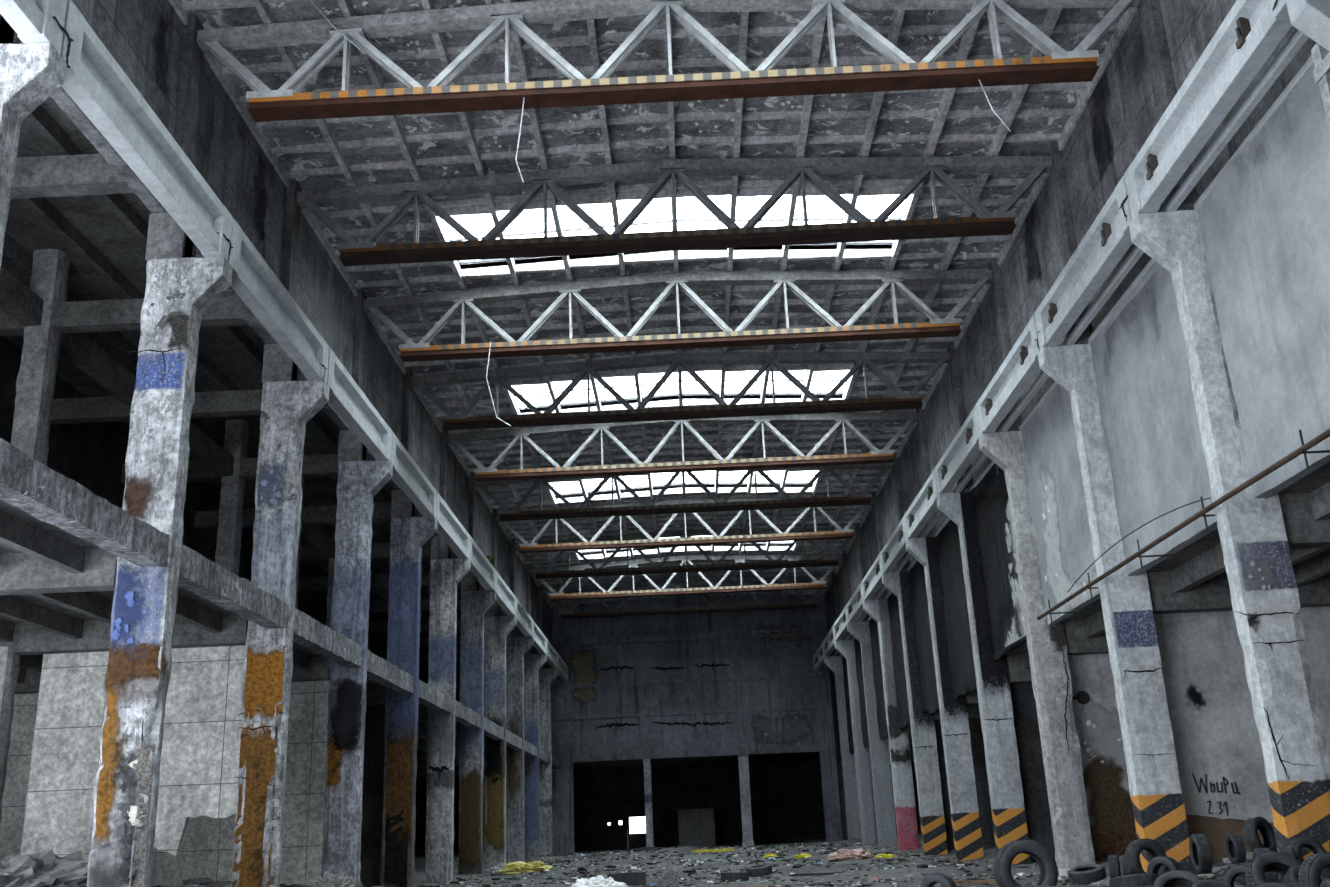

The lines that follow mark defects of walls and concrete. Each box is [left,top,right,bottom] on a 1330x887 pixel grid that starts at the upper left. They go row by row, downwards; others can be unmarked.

peeling [111,565,144,659]
spalling [112,735,156,887]
spalling [268,780,281,845]
spalling [1077,698,1138,862]